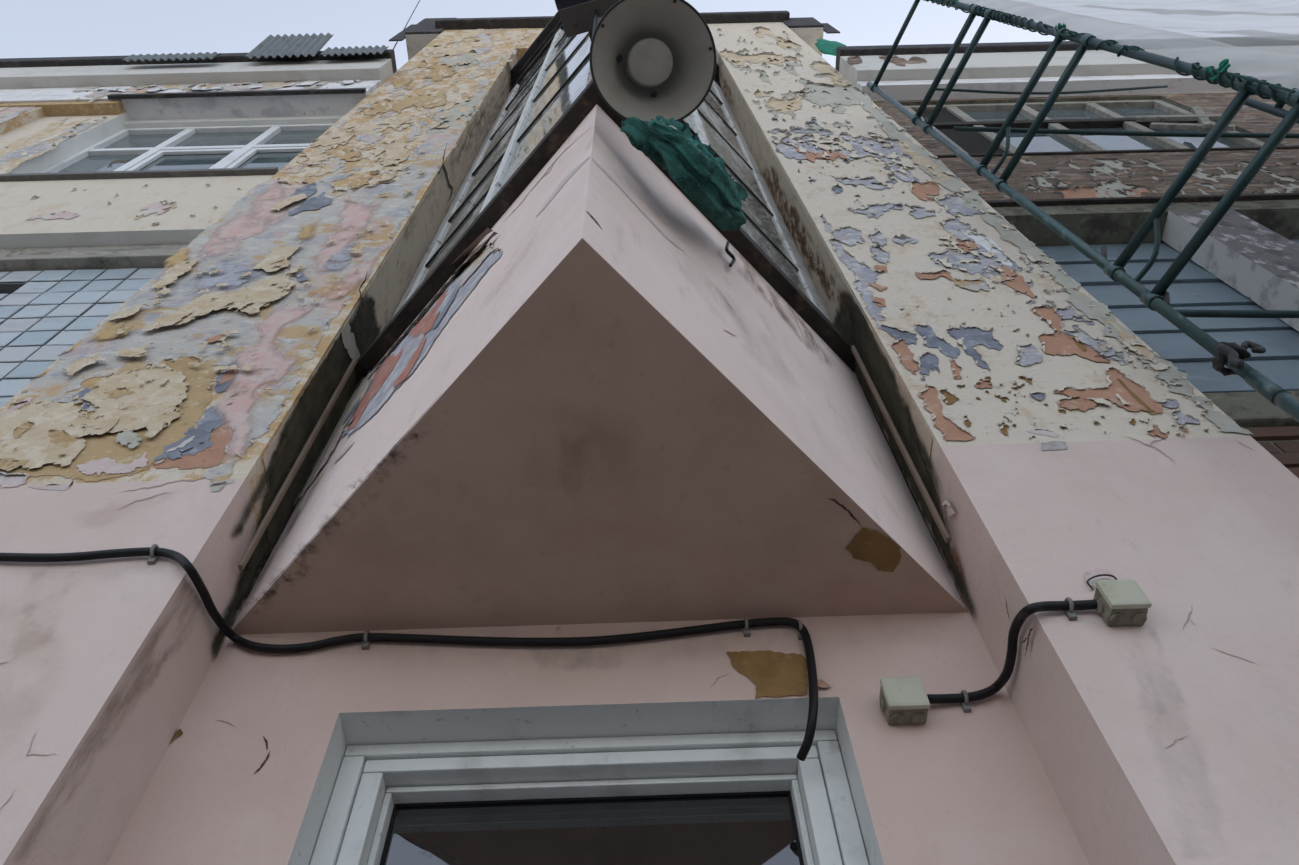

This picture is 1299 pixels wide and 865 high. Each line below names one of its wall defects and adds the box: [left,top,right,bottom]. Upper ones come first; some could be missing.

peeling [1179,158,1299,195]
peeling [718,26,1253,443]
peeling [0,28,531,498]
peeling [845,528,902,572]
peeling [727,650,831,698]
crack [26,729,56,756]